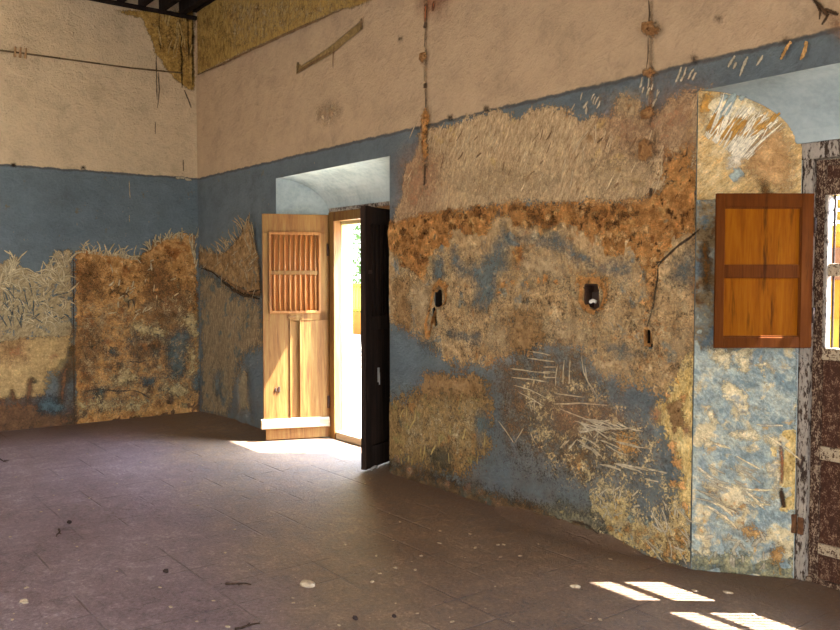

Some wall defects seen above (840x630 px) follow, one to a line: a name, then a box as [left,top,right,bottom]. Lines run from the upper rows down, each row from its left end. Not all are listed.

peeling [117,0,372,90]
flaking render [0,228,263,424]
crack [201,268,261,299]
flaking render [388,83,800,579]
crack [645,229,700,326]